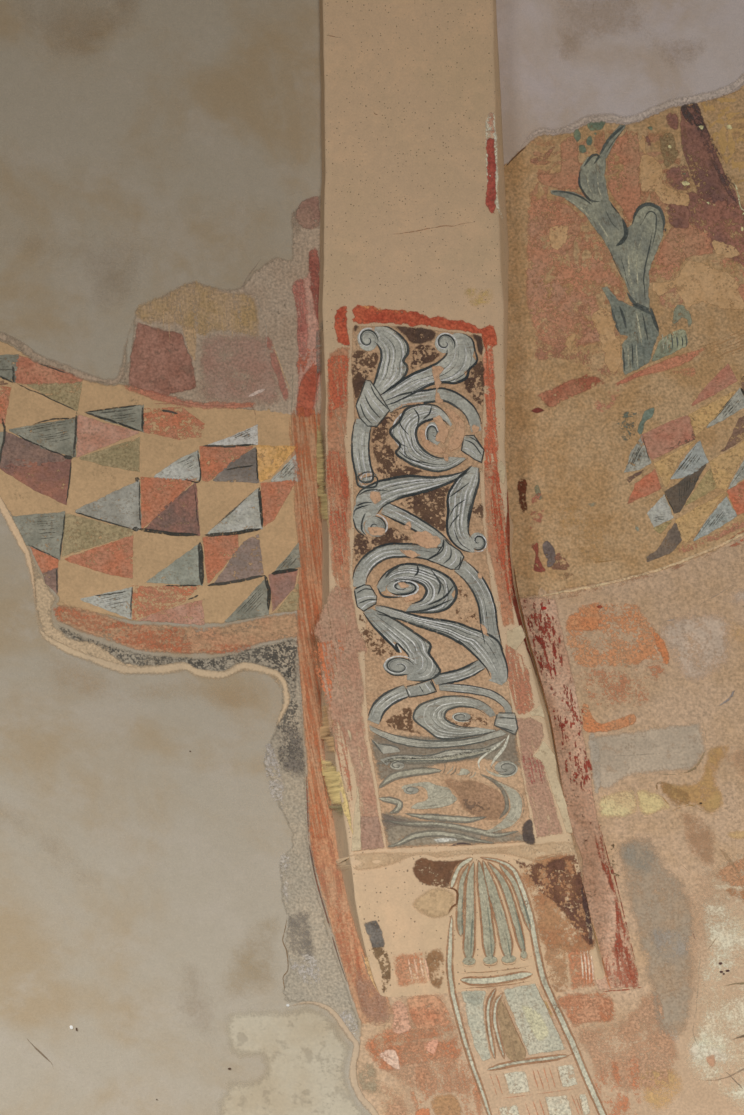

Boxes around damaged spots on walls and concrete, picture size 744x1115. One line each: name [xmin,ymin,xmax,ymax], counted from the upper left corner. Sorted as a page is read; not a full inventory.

flaking render [24,542,182,667]
flaking render [264,653,358,1036]